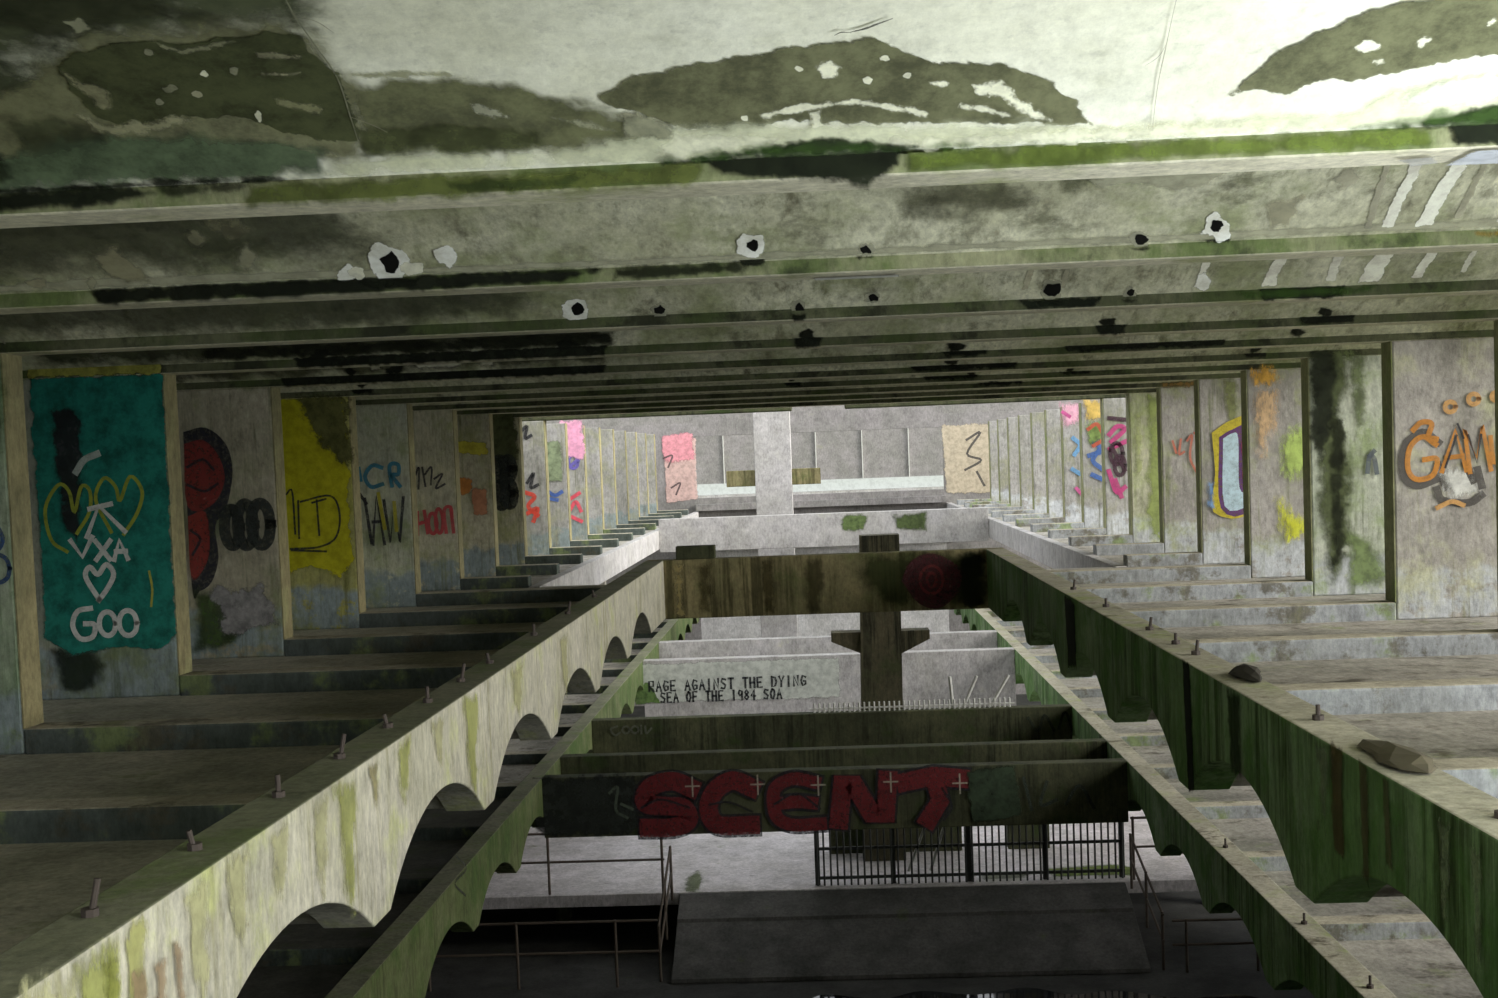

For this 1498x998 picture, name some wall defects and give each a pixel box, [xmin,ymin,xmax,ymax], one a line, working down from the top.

peeling [57,31,359,142]
peeling [600,38,1093,140]
peeling [1230,0,1498,96]
spalling [337,242,457,288]
damp [0,0,1498,394]
spalling [736,233,765,266]
spalling [1201,211,1231,243]
damp [1310,349,1385,584]
damp [52,649,103,691]
damp [1064,596,1076,668]
damp [1182,660,1194,792]
damp [1227,689,1241,776]